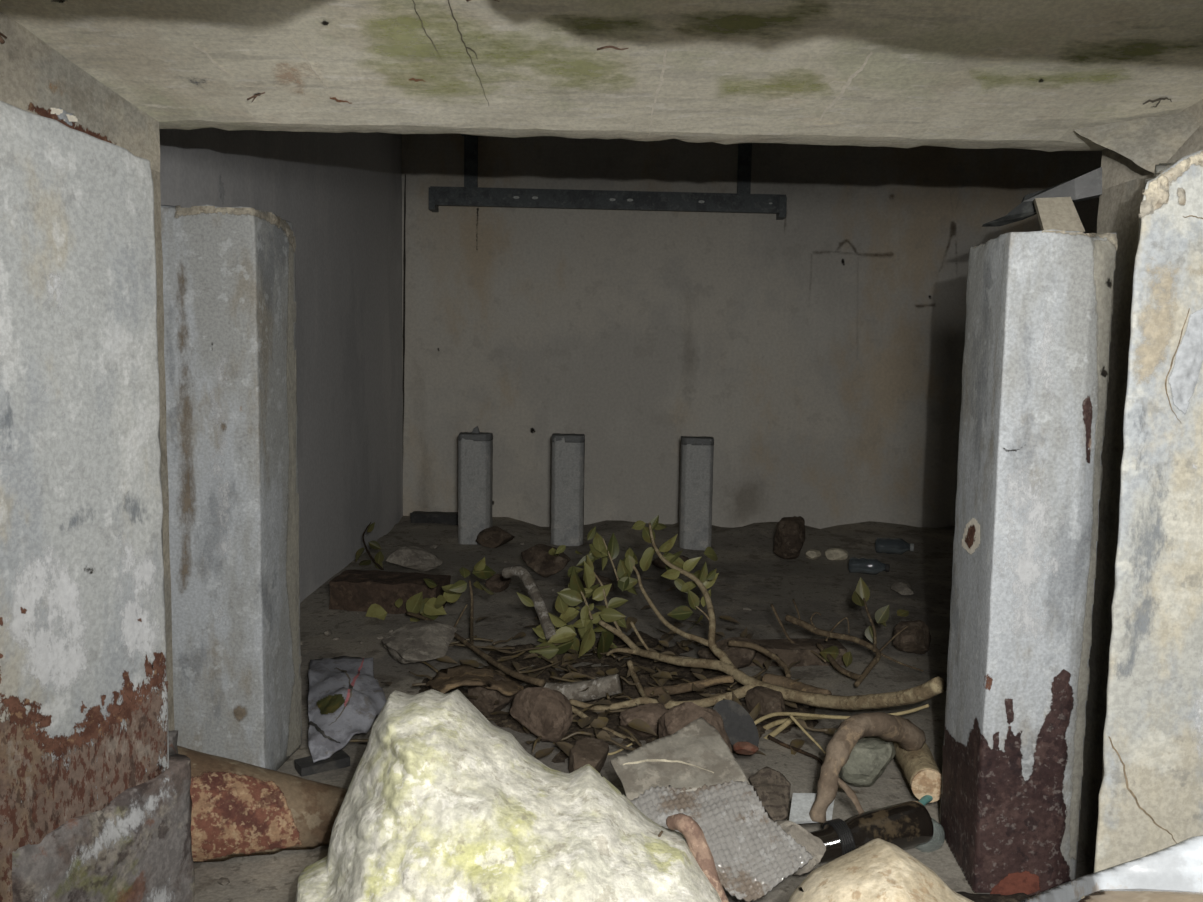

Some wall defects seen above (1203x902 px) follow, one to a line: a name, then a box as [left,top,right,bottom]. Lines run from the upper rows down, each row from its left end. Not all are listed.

rust [28,102,116,145]
crack [412,0,489,105]
crack [1143,97,1171,108]
spalling [1138,151,1203,218]
leakage [180,373,194,586]
rust [1082,396,1092,463]
rust [0,652,168,902]
crack [1109,737,1177,843]